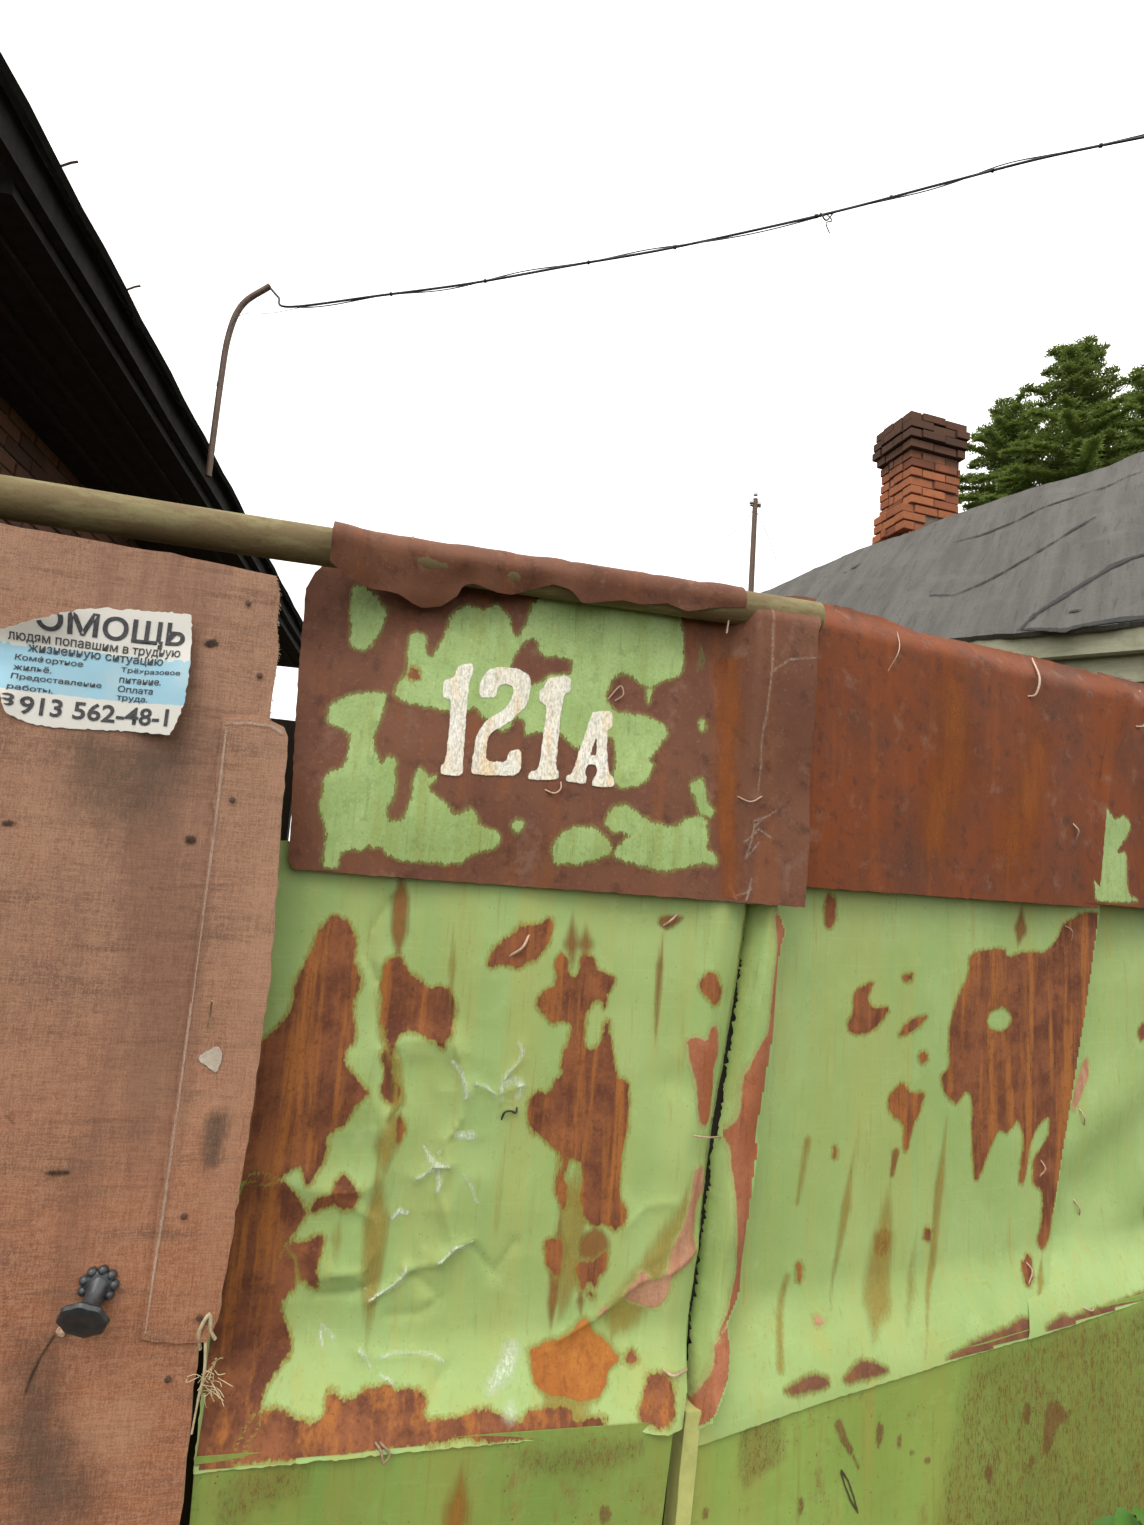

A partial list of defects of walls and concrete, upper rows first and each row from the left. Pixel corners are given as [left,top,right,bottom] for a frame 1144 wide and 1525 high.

rust [407,666,421,681]
rust [847,982,890,1036]
rust [899,1014,927,1036]
rust [887,1082,925,1177]
rust [941,911,1099,1289]
rust [197,879,785,1525]
rust [923,1144,945,1286]